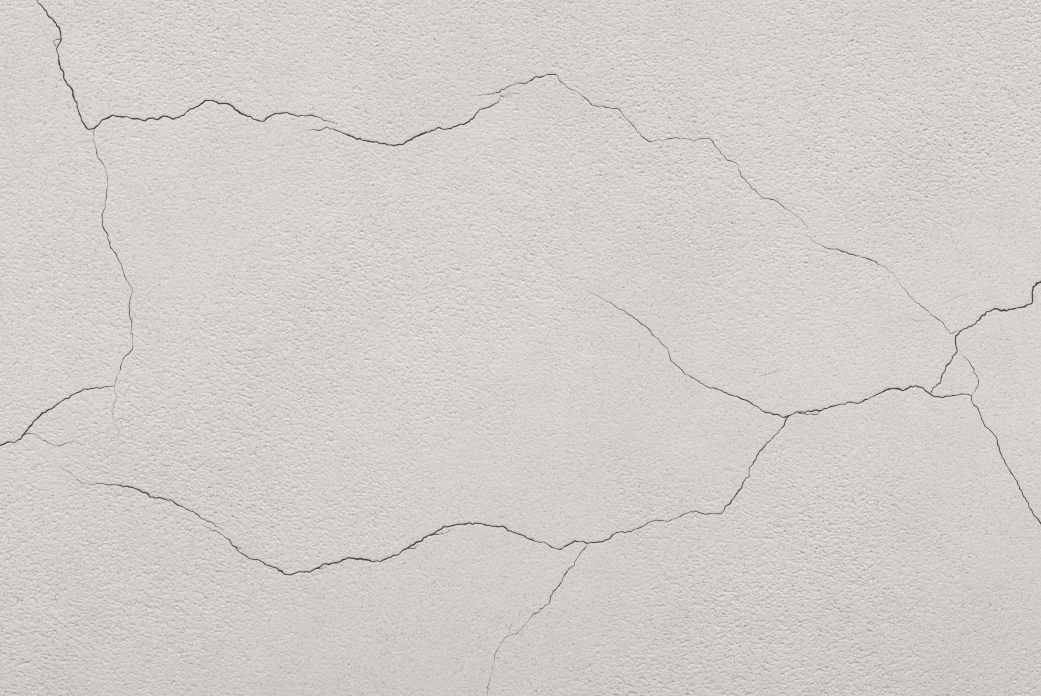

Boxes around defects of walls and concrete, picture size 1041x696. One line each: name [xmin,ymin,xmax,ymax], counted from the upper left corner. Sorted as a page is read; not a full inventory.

crack [0,0,803,446]
crack [62,235,1041,693]